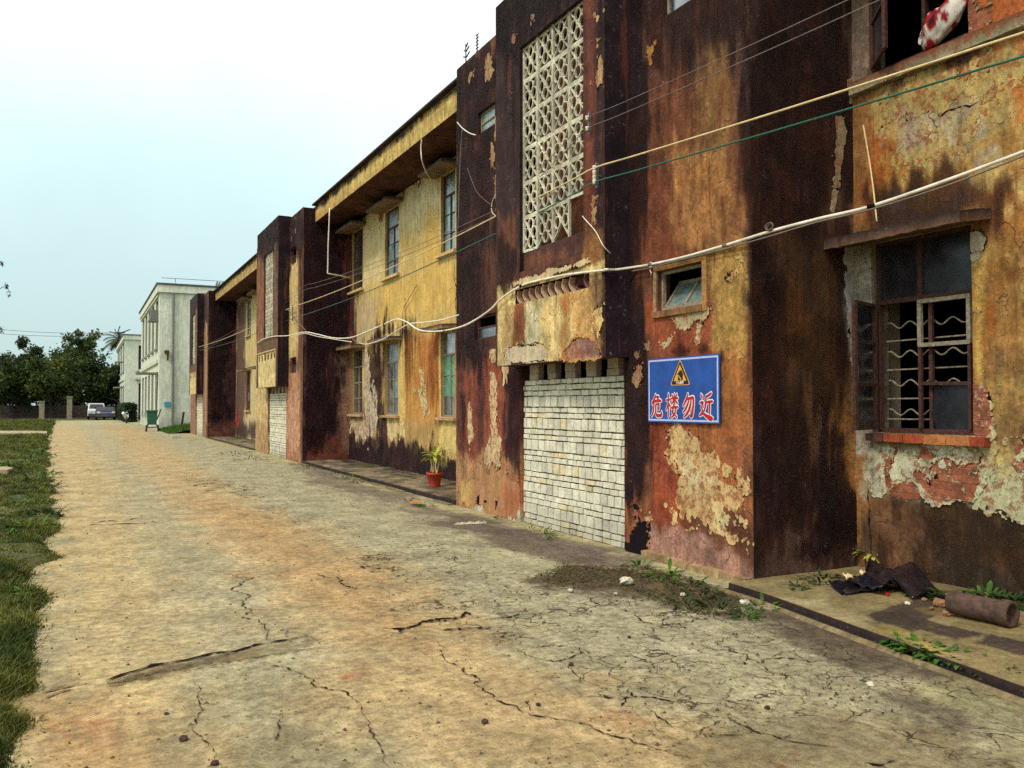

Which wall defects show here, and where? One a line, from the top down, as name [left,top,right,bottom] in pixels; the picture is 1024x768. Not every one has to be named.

peeling [877,46,1024,179]
damp [456,0,577,381]
damp [257,208,456,481]
peeling [349,349,405,450]
peeling [455,301,606,520]
peeling [664,423,754,555]
damp [624,0,1011,568]
spalling [867,378,1024,532]
damp [914,500,1024,599]
crack [42,574,388,766]
crack [382,611,839,764]
crack [581,597,825,681]